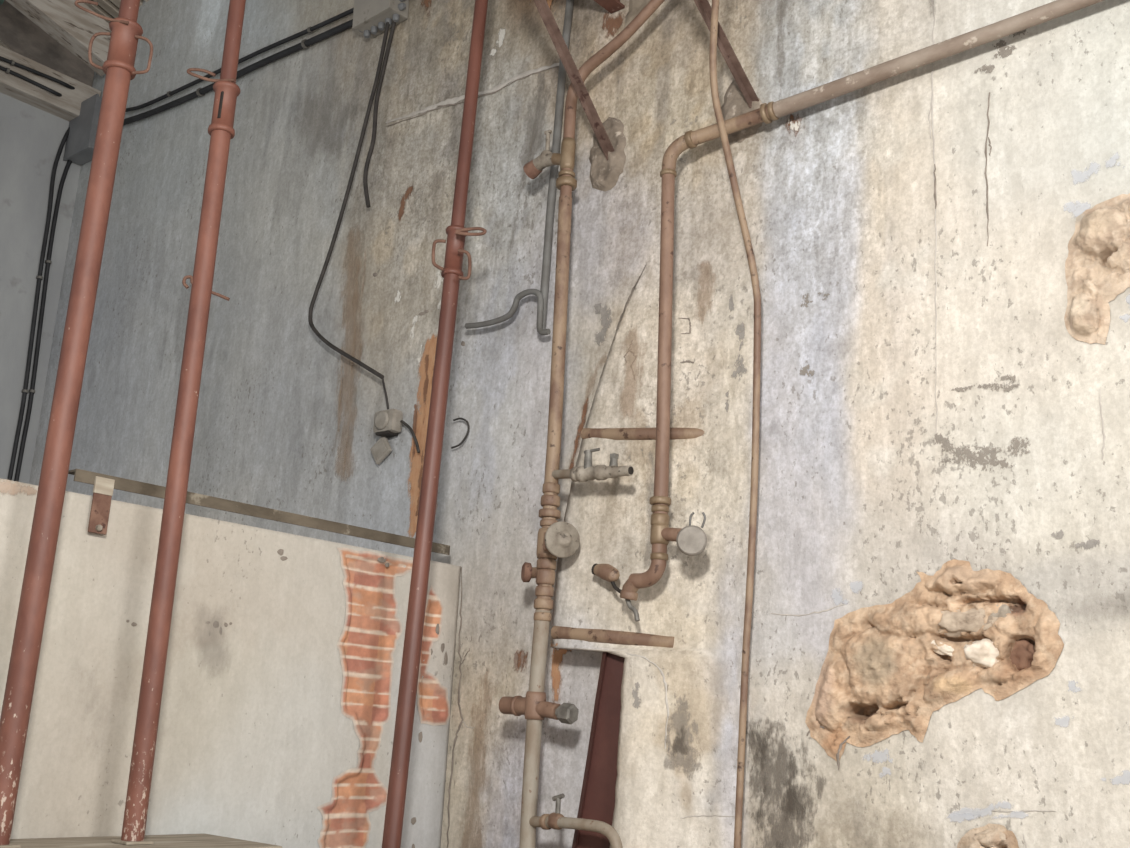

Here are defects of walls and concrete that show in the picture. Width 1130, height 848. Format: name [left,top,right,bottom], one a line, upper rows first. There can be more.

crack [385,63,559,126]
crack [984,92,992,246]
flaking render [1064,193,1130,345]
flaking render [317,548,413,848]
flaking render [805,559,1064,778]
damp [746,720,814,848]
flaking render [948,801,1028,848]